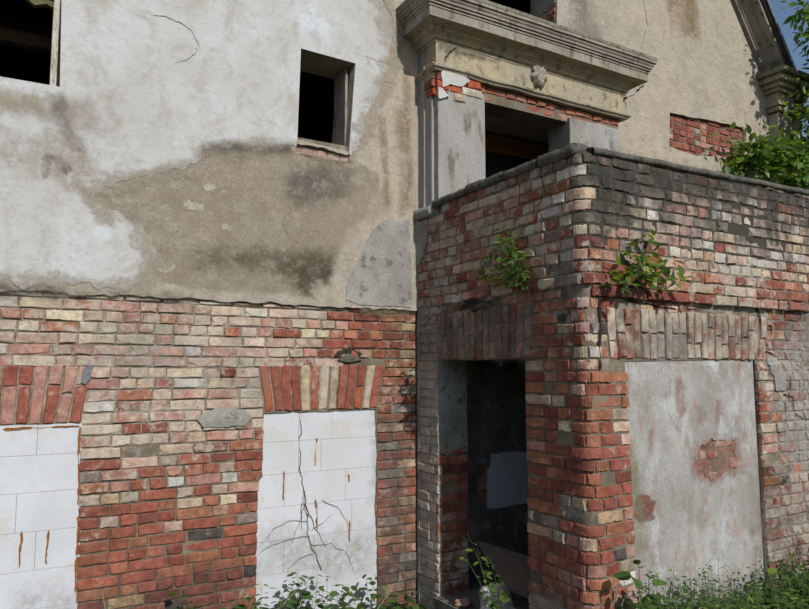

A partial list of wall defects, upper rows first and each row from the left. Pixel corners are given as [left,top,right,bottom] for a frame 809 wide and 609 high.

crack [156,15,200,64]
flaking render [425,58,618,127]
flaking render [669,114,744,158]
water stain [280,254,330,294]
crack [292,418,325,546]
flaking render [693,439,740,482]
spalling [635,494,656,521]